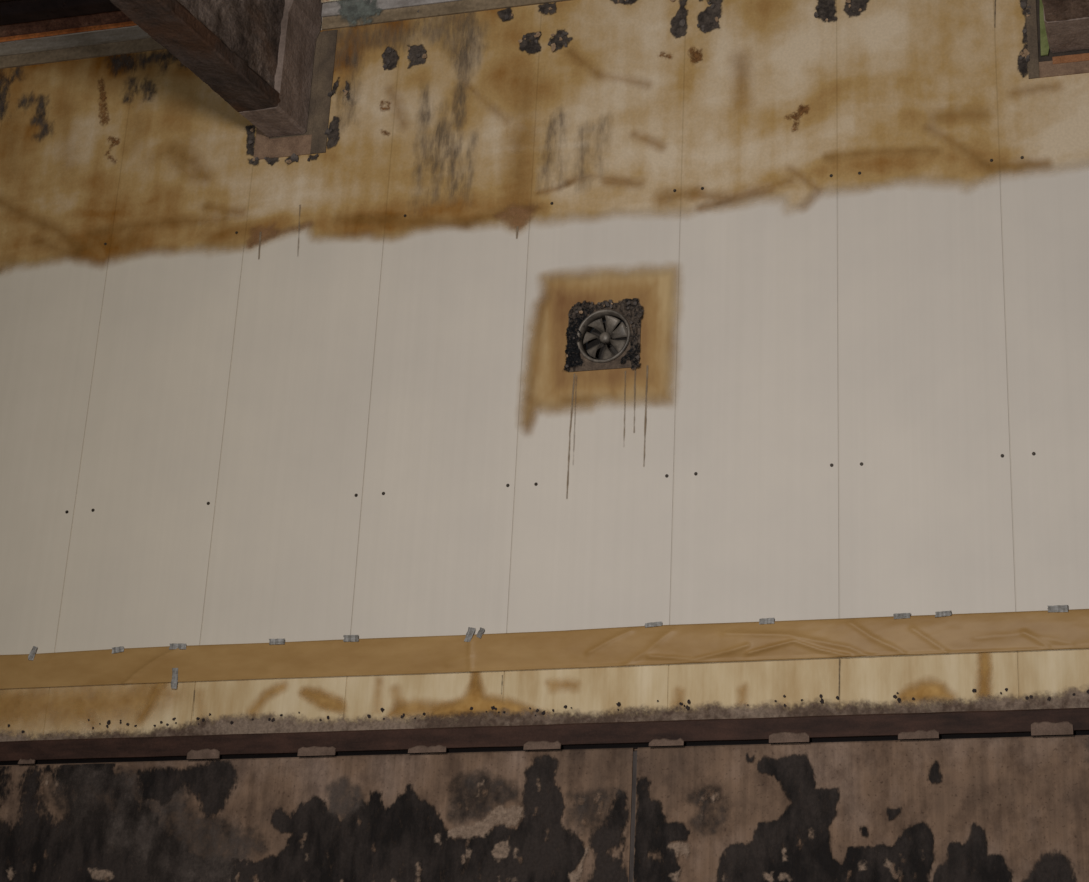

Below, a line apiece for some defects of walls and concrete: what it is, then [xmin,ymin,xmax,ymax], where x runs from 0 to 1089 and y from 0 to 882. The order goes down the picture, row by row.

damp [20,96,49,140]
damp [567,374,577,493]
damp [624,365,648,458]
damp [0,683,168,723]
damp [303,690,342,709]
damp [390,672,534,716]
damp [899,682,953,701]
damp [979,652,989,696]